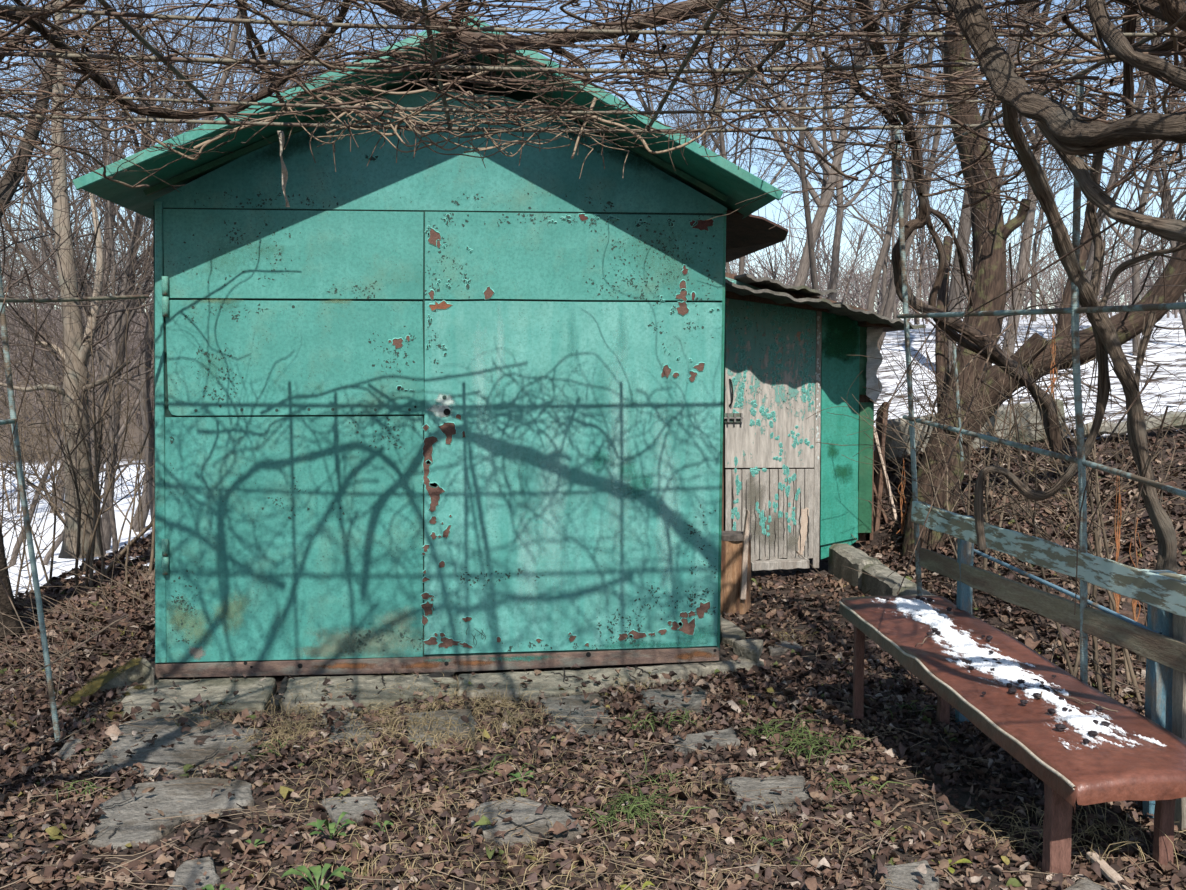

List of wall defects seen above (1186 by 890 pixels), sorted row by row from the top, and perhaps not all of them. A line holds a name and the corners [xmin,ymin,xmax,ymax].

peeling [368,193,495,392]
peeling [484,193,821,555]
peeling [349,413,466,556]
damp [594,403,673,526]
peeling [344,560,474,655]
peeling [449,565,540,590]
peeling [496,636,552,652]
peeling [568,504,717,651]